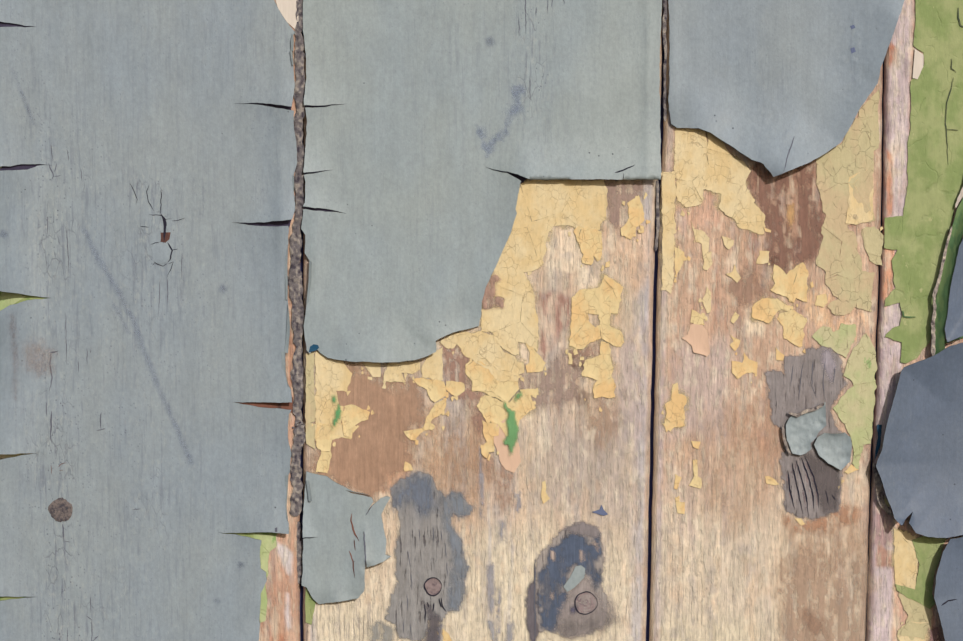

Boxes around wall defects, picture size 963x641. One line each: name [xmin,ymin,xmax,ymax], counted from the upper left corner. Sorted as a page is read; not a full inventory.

peeling [0,0,297,641]
peeling [301,0,905,604]
peeling [873,226,963,641]